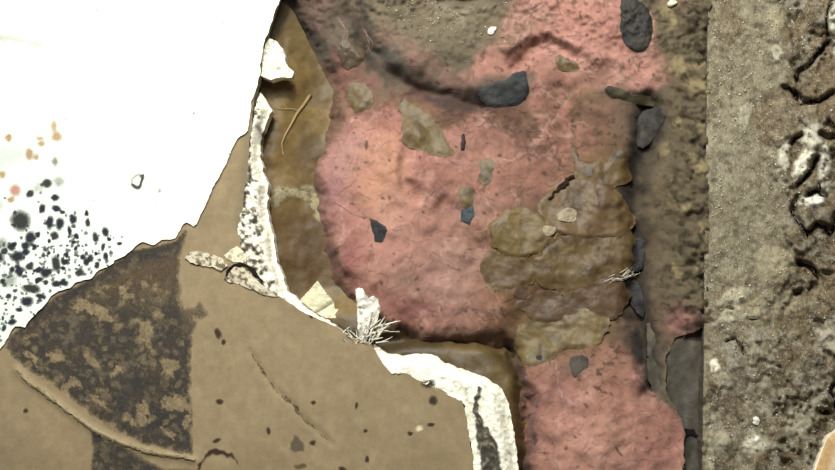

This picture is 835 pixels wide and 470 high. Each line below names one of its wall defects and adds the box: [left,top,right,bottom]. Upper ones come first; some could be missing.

flaking render [261,39,296,83]
crack [785,0,835,105]
crack [791,123,835,145]
flaking render [237,92,338,327]
crack [790,158,835,238]
crack [796,263,831,295]
mould [0,179,204,453]
flaking render [373,344,519,470]
mould [92,433,162,470]
mould [198,438,235,469]
flaking render [812,429,835,470]